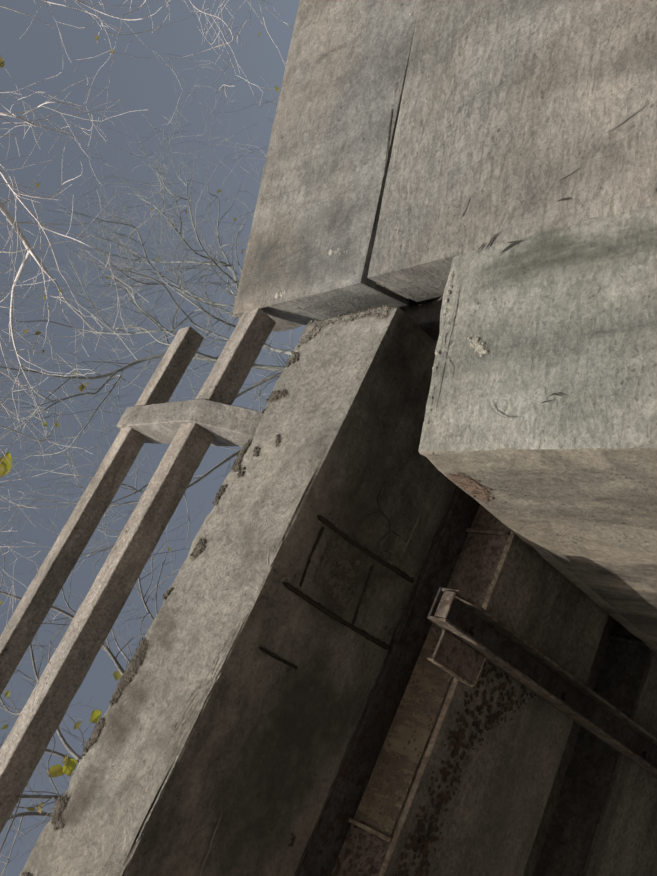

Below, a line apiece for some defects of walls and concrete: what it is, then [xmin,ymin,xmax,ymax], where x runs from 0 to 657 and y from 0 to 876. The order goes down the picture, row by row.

spalling [266,389,287,403]
spalling [230,439,260,478]
spalling [190,539,205,558]
spalling [282,515,414,651]
spalling [109,637,147,707]
spalling [78,717,104,761]
flaking render [131,611,249,848]
rust [395,661,540,876]
spalling [50,793,67,831]